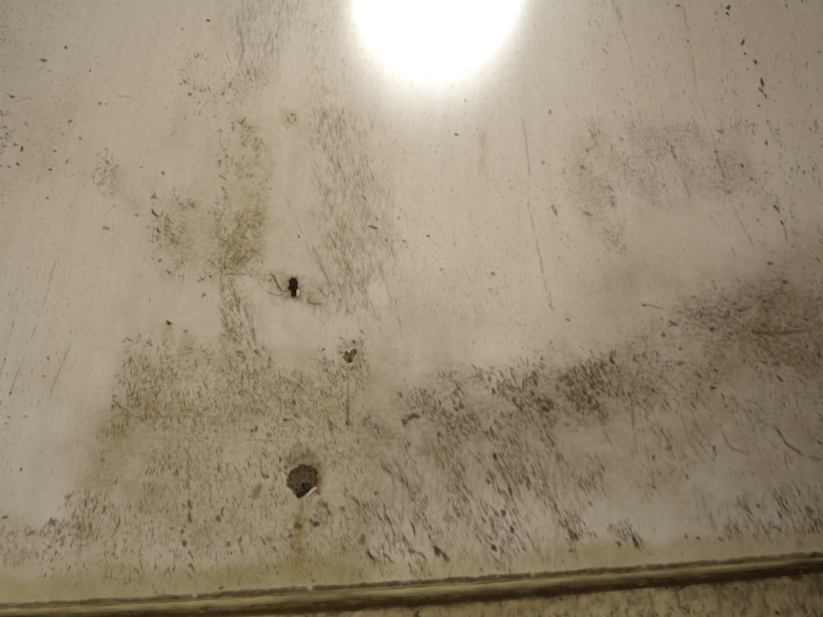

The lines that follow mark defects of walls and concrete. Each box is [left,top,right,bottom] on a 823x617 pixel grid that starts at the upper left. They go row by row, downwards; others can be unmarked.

spalling [287,464,318,498]
leakage [198,556,766,597]
leakage [378,586,598,606]